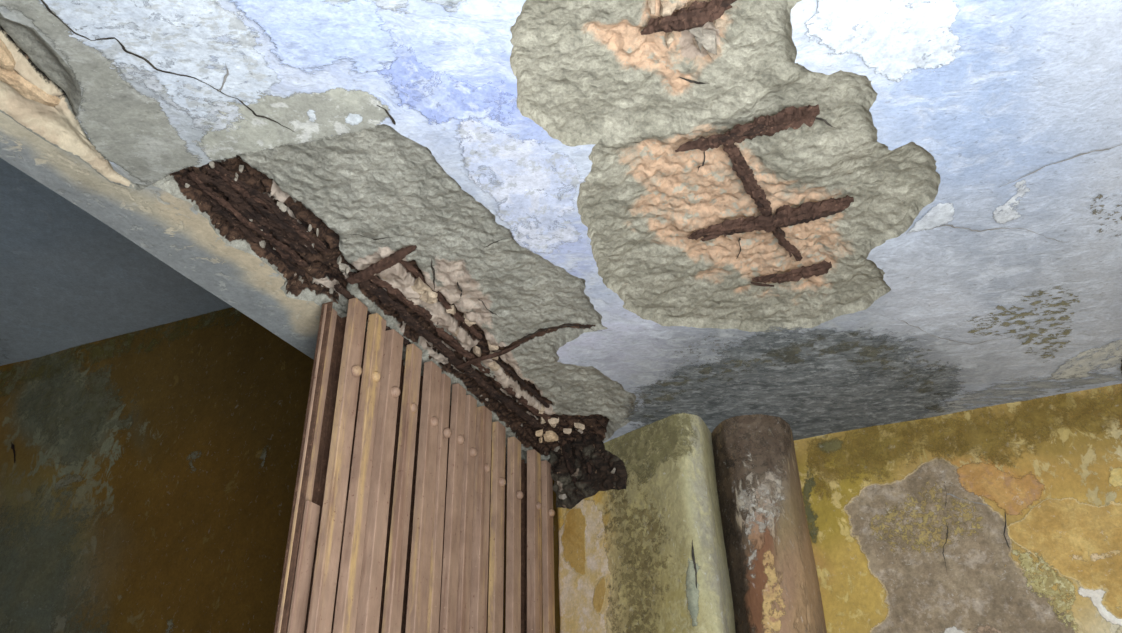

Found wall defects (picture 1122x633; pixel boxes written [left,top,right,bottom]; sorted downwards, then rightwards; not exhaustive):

crack [41,0,294,132]
spalling [229,0,962,332]
crack [999,144,1122,188]
spalling [0,0,636,633]
peeling [686,558,699,627]
peeling [738,454,787,633]
leakage [610,326,1122,633]
peeling [844,457,1122,633]